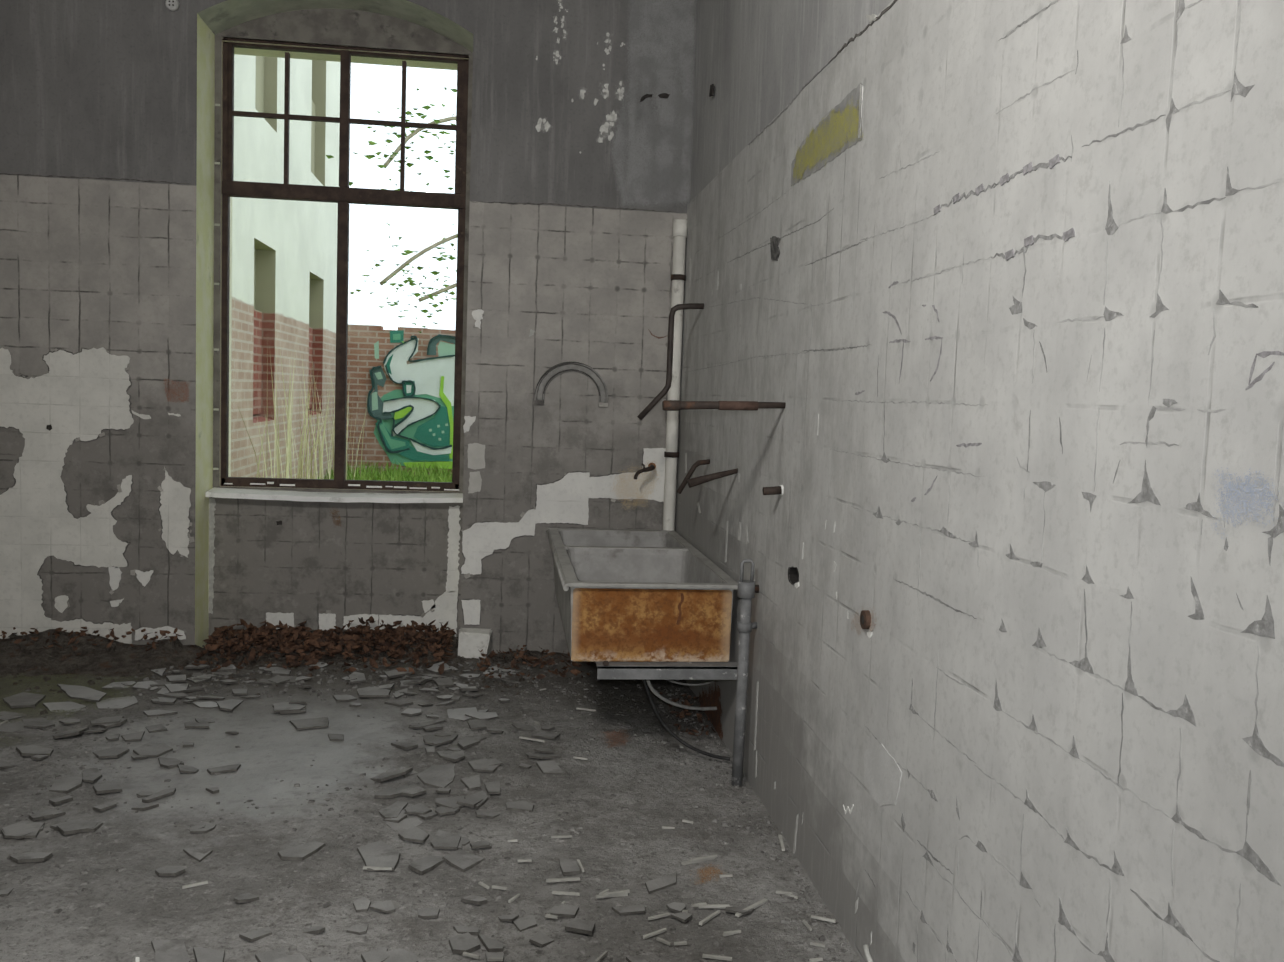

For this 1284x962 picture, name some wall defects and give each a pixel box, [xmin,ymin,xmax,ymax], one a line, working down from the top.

crack [748,0,897,145]
crack [998,0,1059,41]
crack [1071,0,1241,160]
crack [805,215,991,285]
peeling [0,347,186,644]
peeling [158,467,216,614]
peeling [463,416,485,493]
peeling [319,448,666,637]
crack [687,344,987,477]
crack [893,578,977,619]
crack [1017,180,1284,561]
crack [911,589,1182,962]